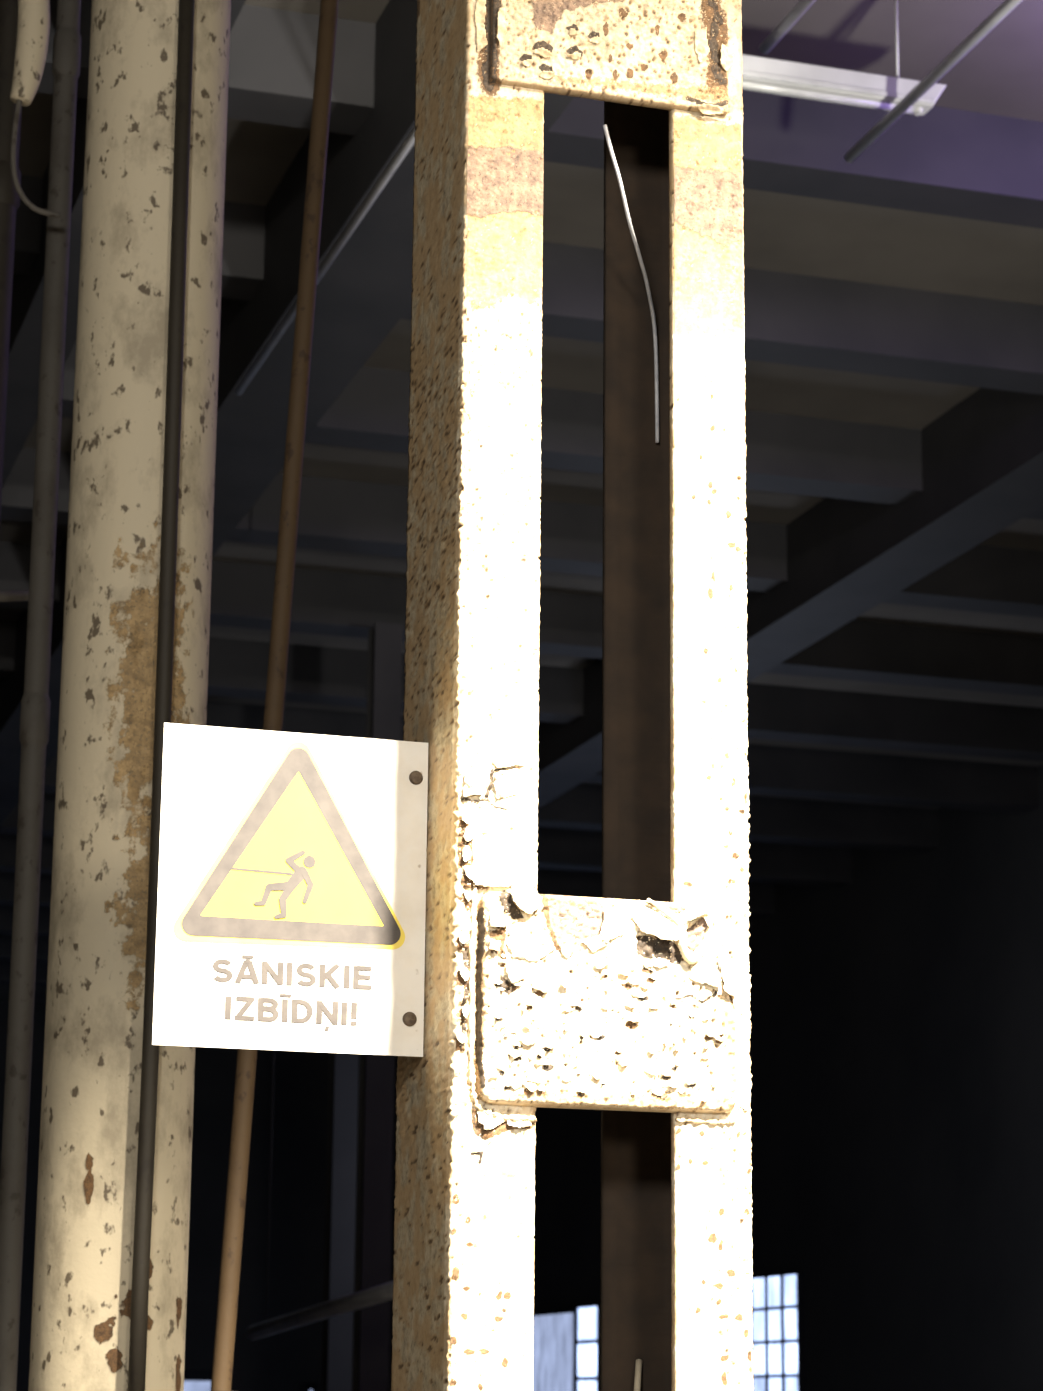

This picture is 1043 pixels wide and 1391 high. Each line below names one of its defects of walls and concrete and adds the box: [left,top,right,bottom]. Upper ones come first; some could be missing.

crack [460,757,528,810]
peeling [458,814,481,911]
peeling [456,930,470,988]
peeling [489,882,740,1102]
peeling [455,1005,470,1052]